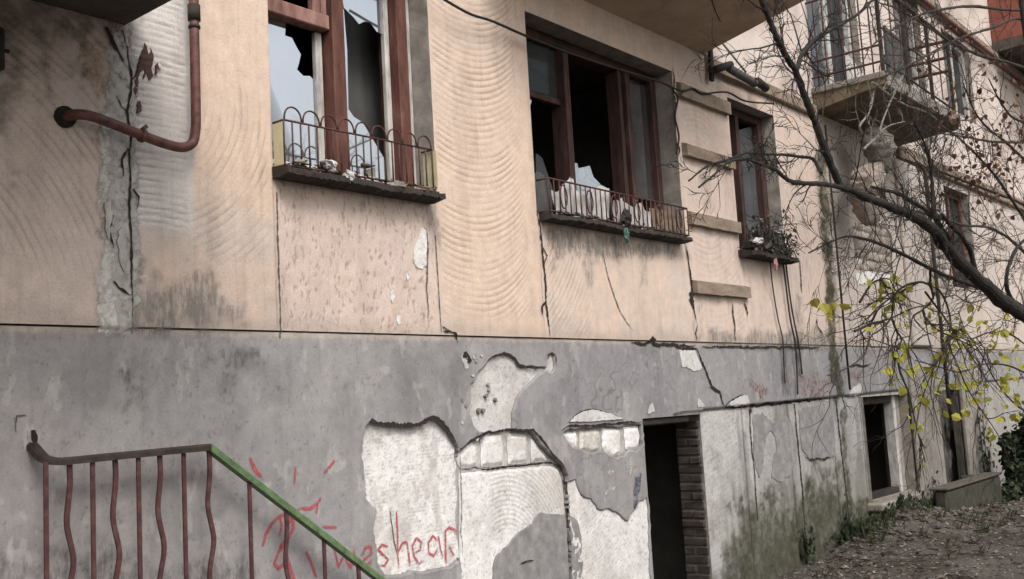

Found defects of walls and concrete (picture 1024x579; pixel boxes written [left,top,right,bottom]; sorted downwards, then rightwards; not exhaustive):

peeling [133,43,162,113]
peeling [103,199,128,272]
crack [105,27,140,329]
peeling [406,226,429,319]
crack [537,211,550,339]
peeling [679,350,702,371]
crack [601,243,849,520]
flaking render [359,351,655,579]